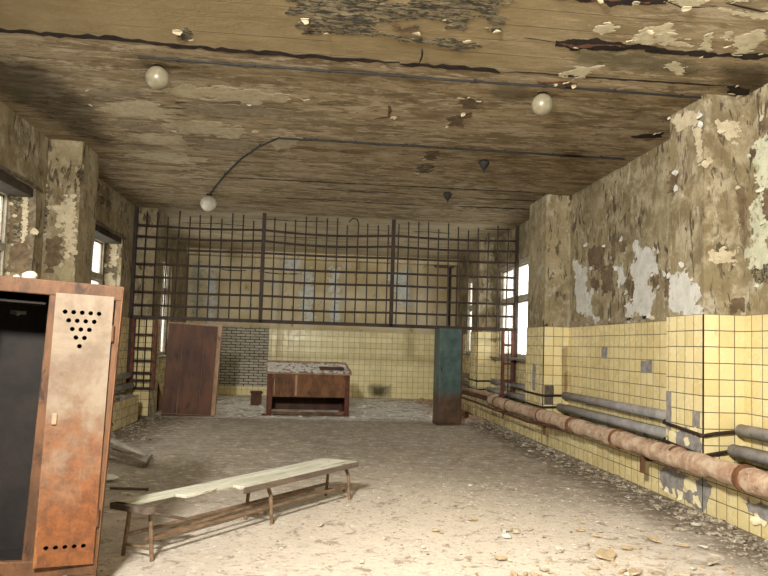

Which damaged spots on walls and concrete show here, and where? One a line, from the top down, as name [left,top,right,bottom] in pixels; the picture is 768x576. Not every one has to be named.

spalling [284,0,515,63]
peeling [589,22,621,35]
peeling [626,0,768,56]
peeling [559,65,605,79]
flaking render [667,110,713,168]
flaking render [4,164,84,276]
peeling [708,115,768,291]
flaking render [103,243,119,286]
flaking render [569,234,704,326]
peeling [729,295,745,315]
spalling [666,391,702,453]
spalling [659,465,712,512]